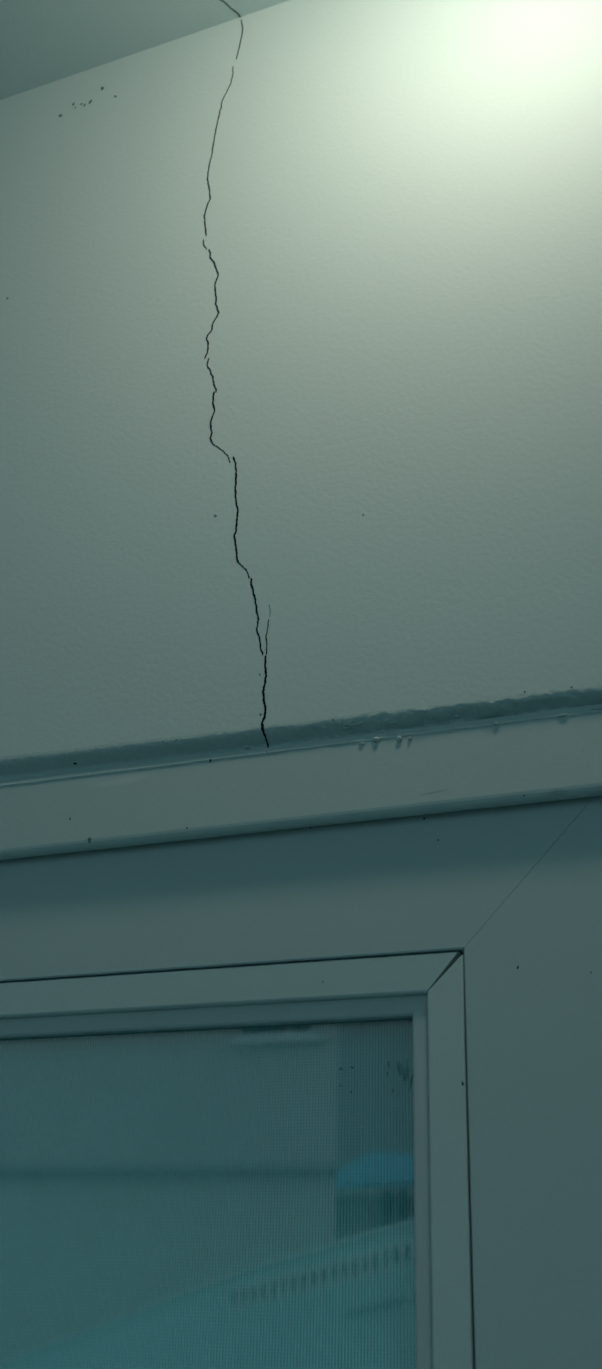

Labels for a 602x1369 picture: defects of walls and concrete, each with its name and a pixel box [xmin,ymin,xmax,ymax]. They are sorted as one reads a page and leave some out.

crack [203,0,271,753]